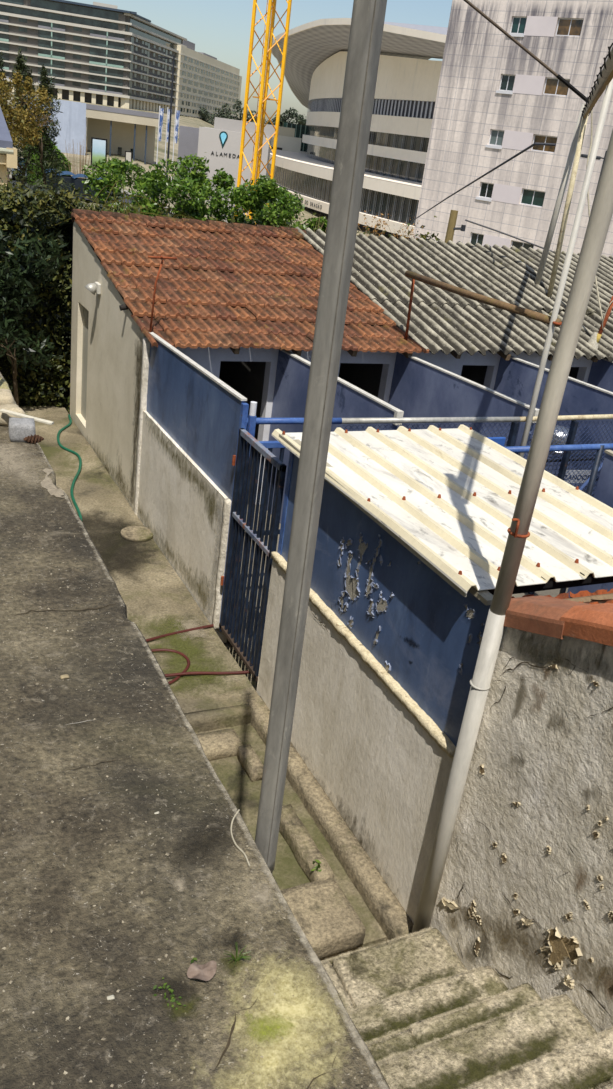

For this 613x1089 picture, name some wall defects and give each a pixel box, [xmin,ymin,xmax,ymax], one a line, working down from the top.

peeling [337,533,394,645]
water stain [514,677,523,716]
crack [490,657,599,709]
spalling [540,927,594,989]